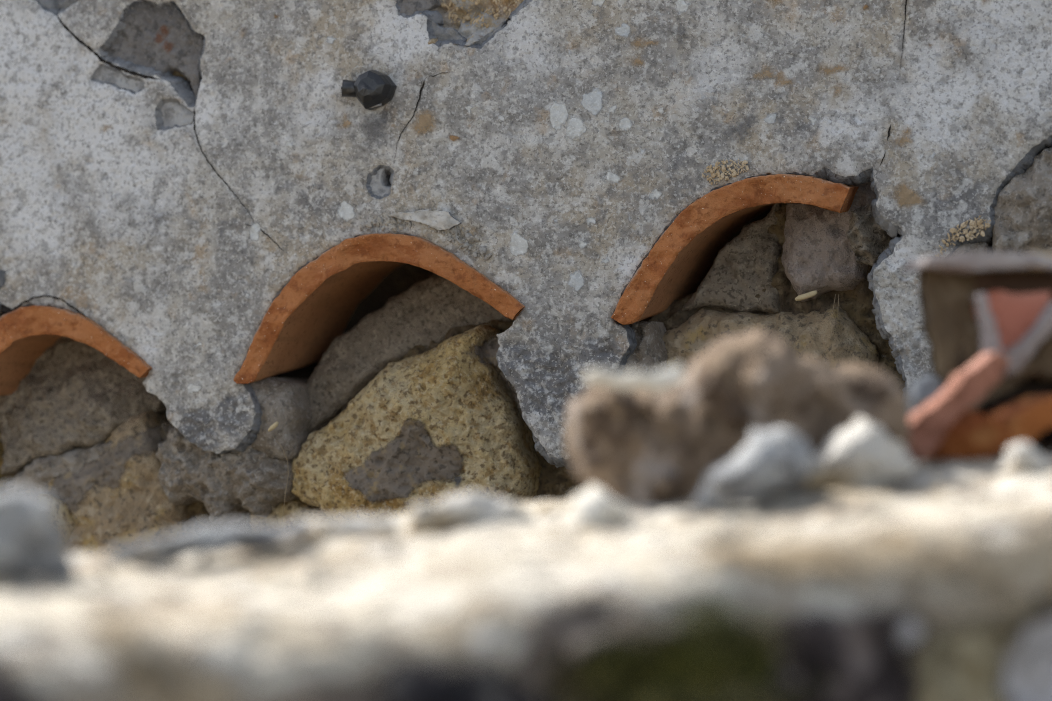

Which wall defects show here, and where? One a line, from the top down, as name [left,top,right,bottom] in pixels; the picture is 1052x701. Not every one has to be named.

crack [57,15,157,79]
flaking render [94,1,204,99]
flaking render [398,0,521,46]
crack [394,72,447,162]
crack [193,111,282,250]
flaking render [583,363,684,392]